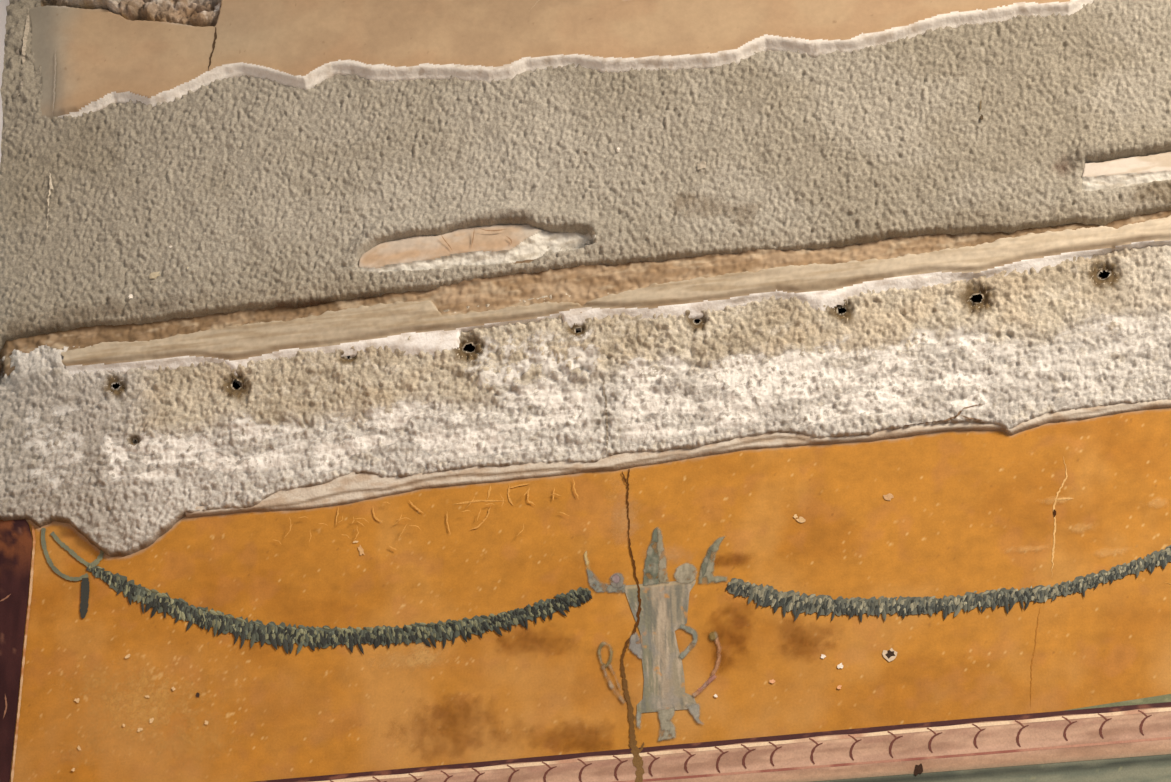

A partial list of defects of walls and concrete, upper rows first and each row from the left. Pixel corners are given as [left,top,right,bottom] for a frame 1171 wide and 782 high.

spalling [41,0,1094,118]
spalling [1082,170,1171,191]
spalling [359,230,594,273]
spalling [0,240,1171,557]
crack [602,375,645,782]